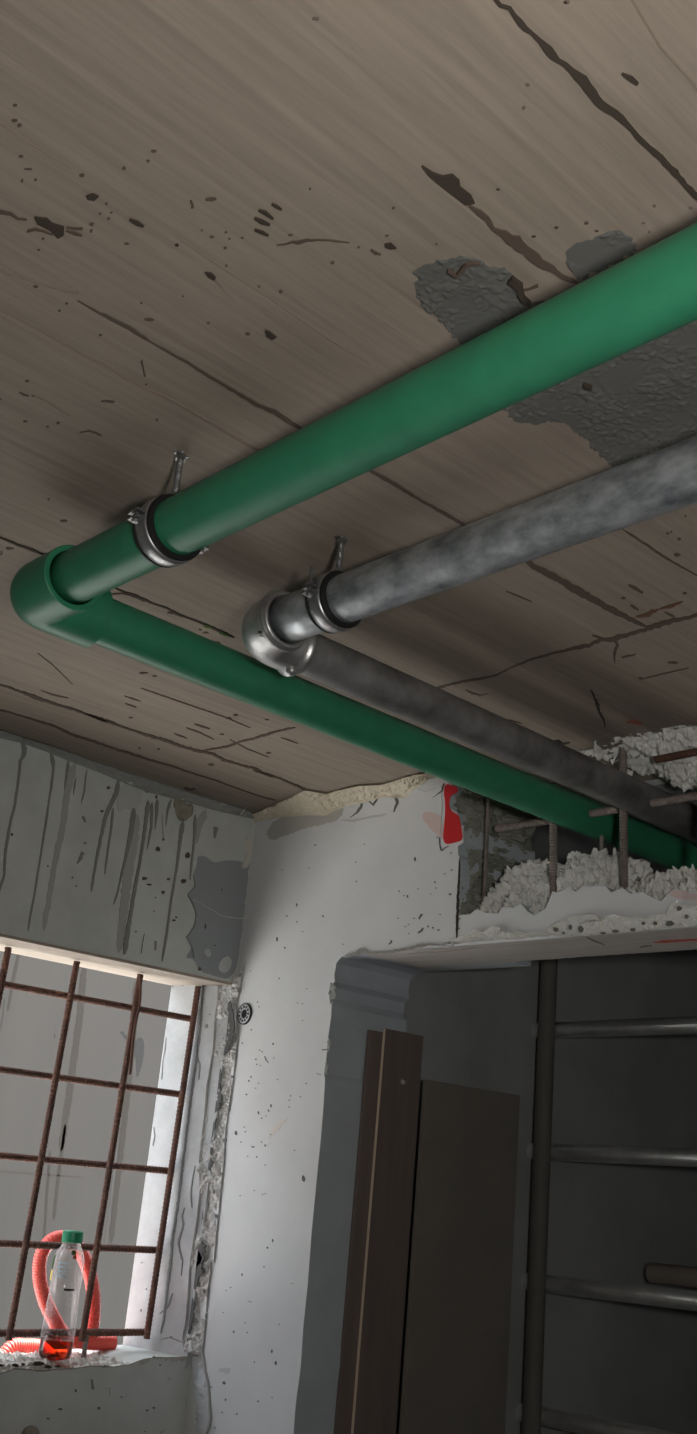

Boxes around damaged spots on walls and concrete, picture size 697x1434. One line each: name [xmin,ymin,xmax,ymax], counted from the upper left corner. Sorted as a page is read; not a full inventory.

crack [494,0,697,200]
crack [77,300,301,429]
spalling [412,243,544,345]
crack [469,205,578,284]
spalling [503,320,697,467]
spalling [565,221,651,280]
crack [437,561,697,727]
damp [0,742,27,891]
damp [28,752,87,931]
damp [91,779,250,979]
spalling [342,788,697,956]
spalling [576,725,697,792]